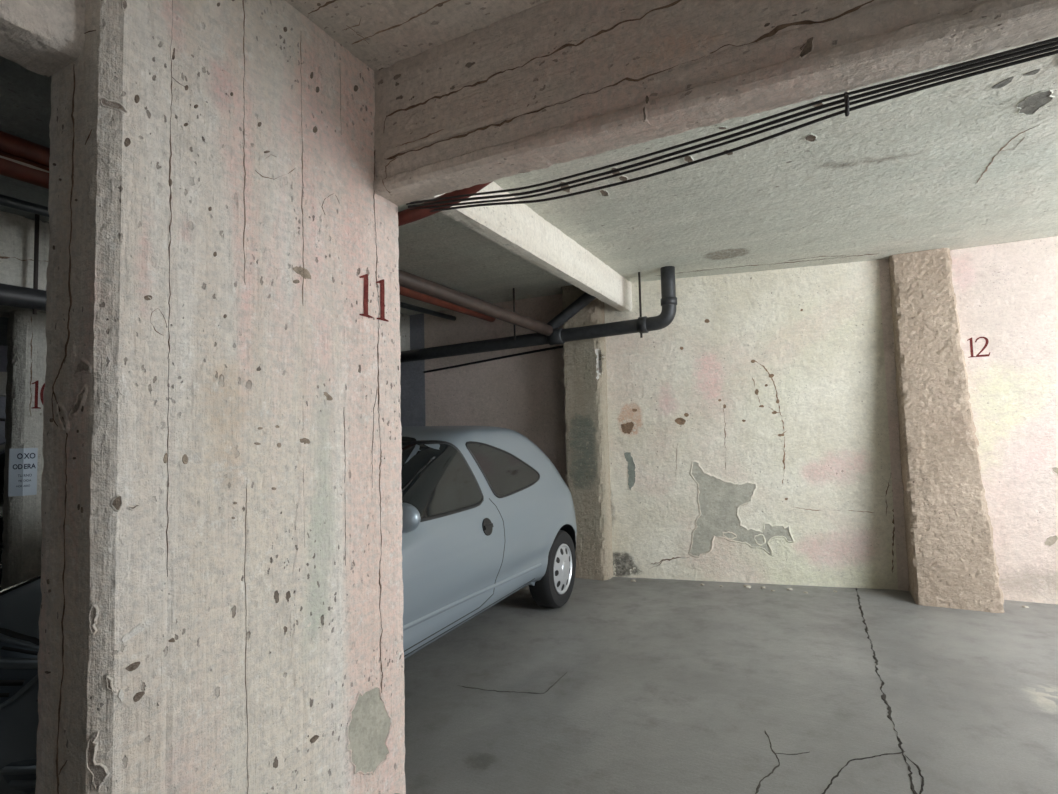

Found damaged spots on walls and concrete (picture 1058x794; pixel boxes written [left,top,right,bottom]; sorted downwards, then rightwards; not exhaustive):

crack [344,0,451,44]
crack [242,0,338,303]
crack [977,127,1034,183]
crack [372,0,874,694]
crack [0,66,92,794]
crack [241,484,249,595]
peeling [688,460,795,558]
crack [796,477,895,573]
crack [243,630,251,794]
crack [755,731,809,794]
crack [822,588,924,794]